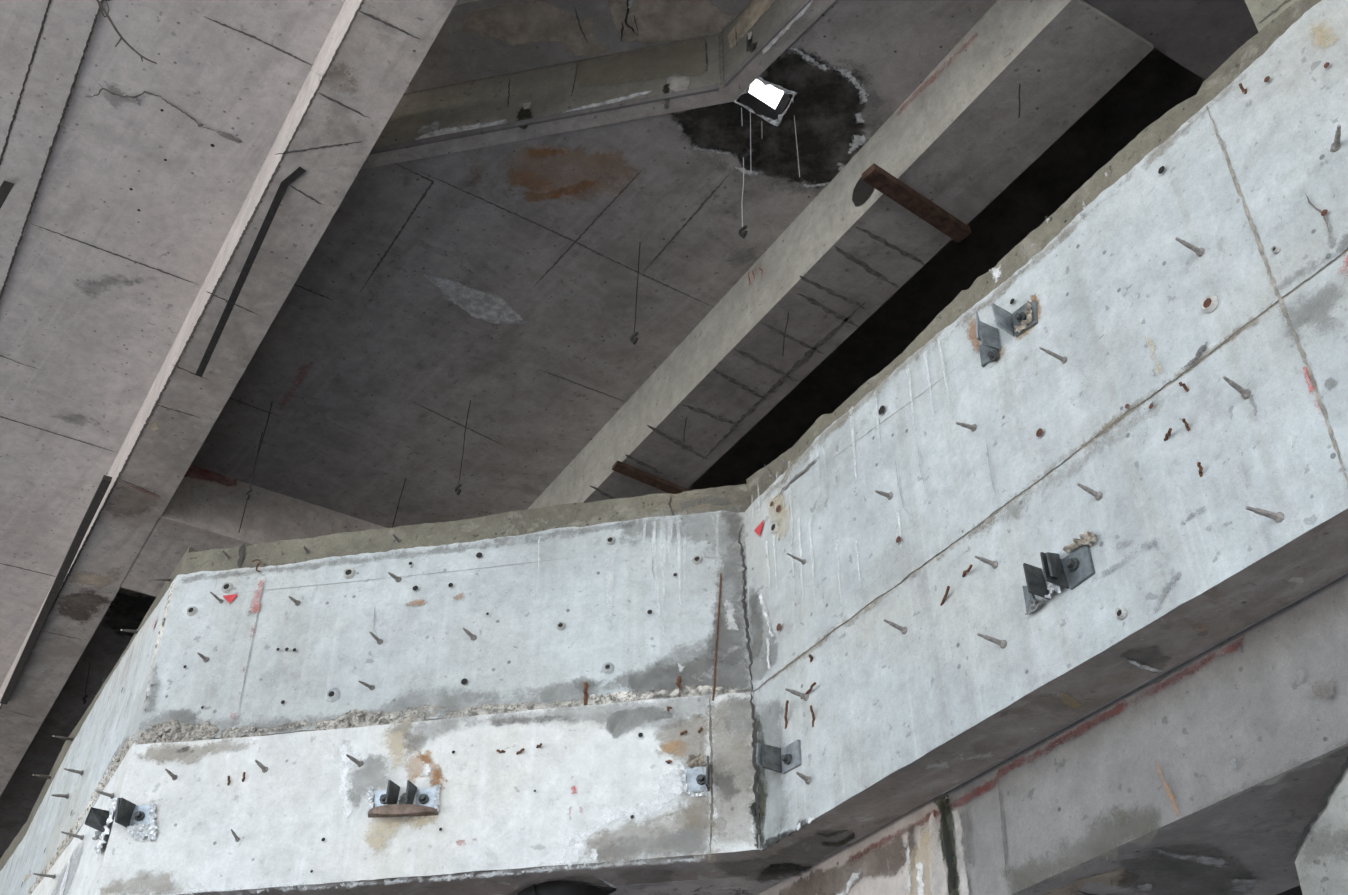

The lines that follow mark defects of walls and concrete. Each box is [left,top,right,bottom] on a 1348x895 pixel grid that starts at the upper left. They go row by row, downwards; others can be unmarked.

crack [85,83,216,131]
corrosion [862,163,971,243]